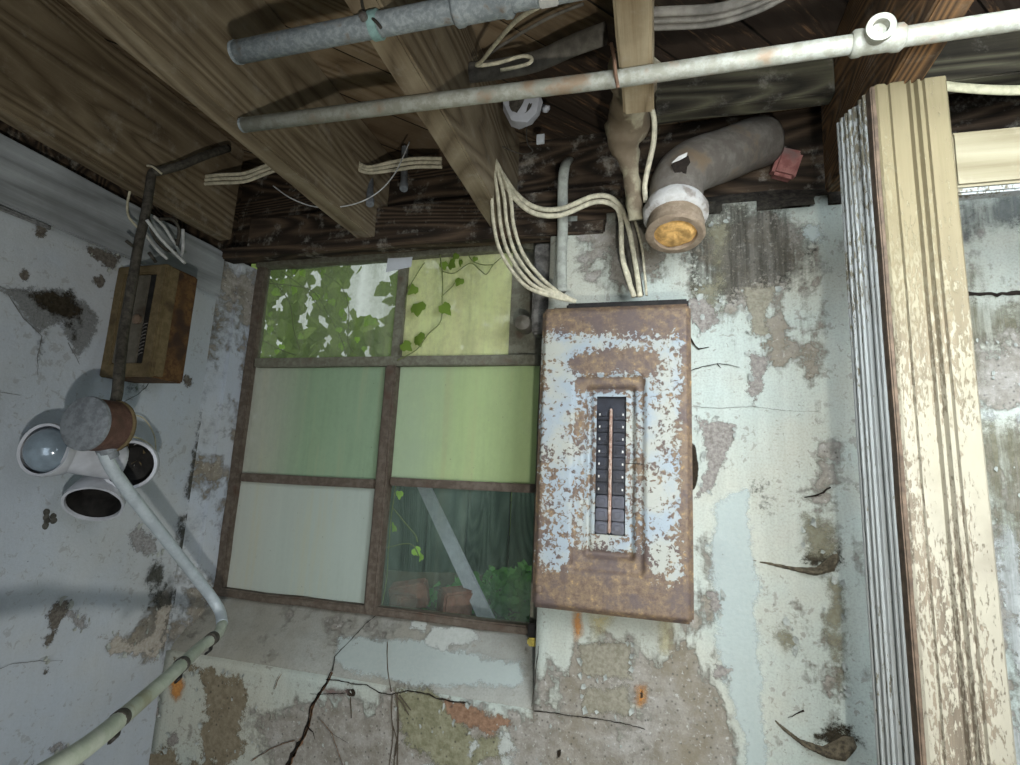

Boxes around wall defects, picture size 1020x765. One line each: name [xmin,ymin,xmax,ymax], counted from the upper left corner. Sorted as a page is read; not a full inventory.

peeling [86,244,126,288]
flaking render [688,217,730,337]
flaking render [741,284,782,339]
crack [968,289,1020,297]
flaking render [745,350,773,407]
flaking render [692,415,737,498]
water stain [982,422,1020,565]
peeling [43,596,90,675]
flaking render [822,573,852,700]
flaking render [149,664,267,765]
crack [250,616,466,765]
spalling [419,696,517,737]